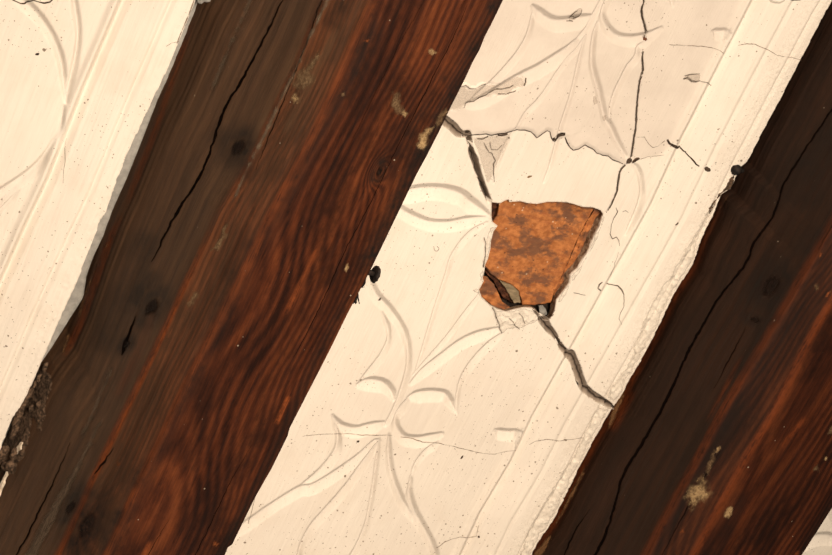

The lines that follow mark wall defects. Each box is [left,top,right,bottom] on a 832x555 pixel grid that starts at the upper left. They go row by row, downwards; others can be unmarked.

crack [442,116,492,201]
peeling [461,78,527,108]
crack [573,0,699,324]
flaking render [474,199,604,333]
spalling [608,176,734,400]
crack [532,308,616,409]
spalling [521,409,607,555]